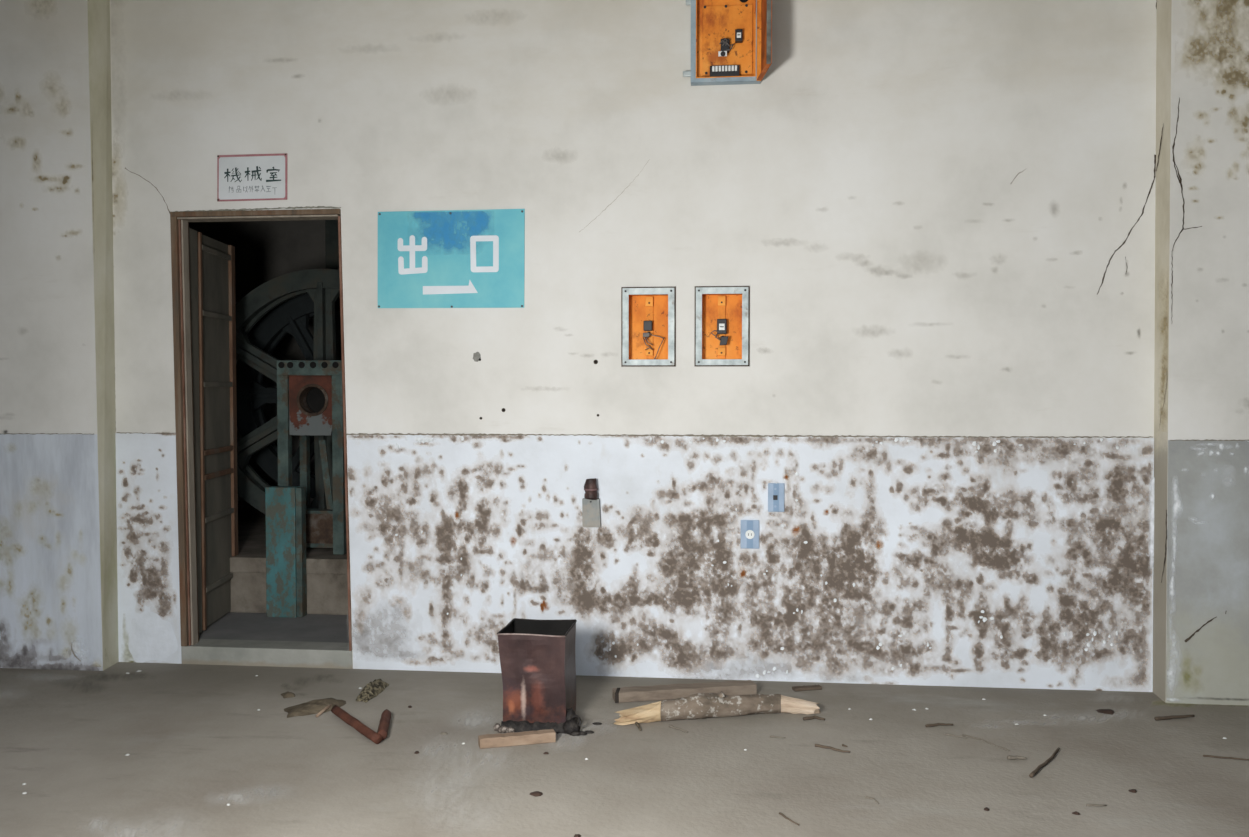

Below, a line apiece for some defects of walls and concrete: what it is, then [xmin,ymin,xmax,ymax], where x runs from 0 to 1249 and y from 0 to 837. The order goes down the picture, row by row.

damp [1187,0,1249,132]
crack [1097,98,1202,320]
damp [563,512,605,617]
damp [0,623,99,671]
damp [353,609,410,658]